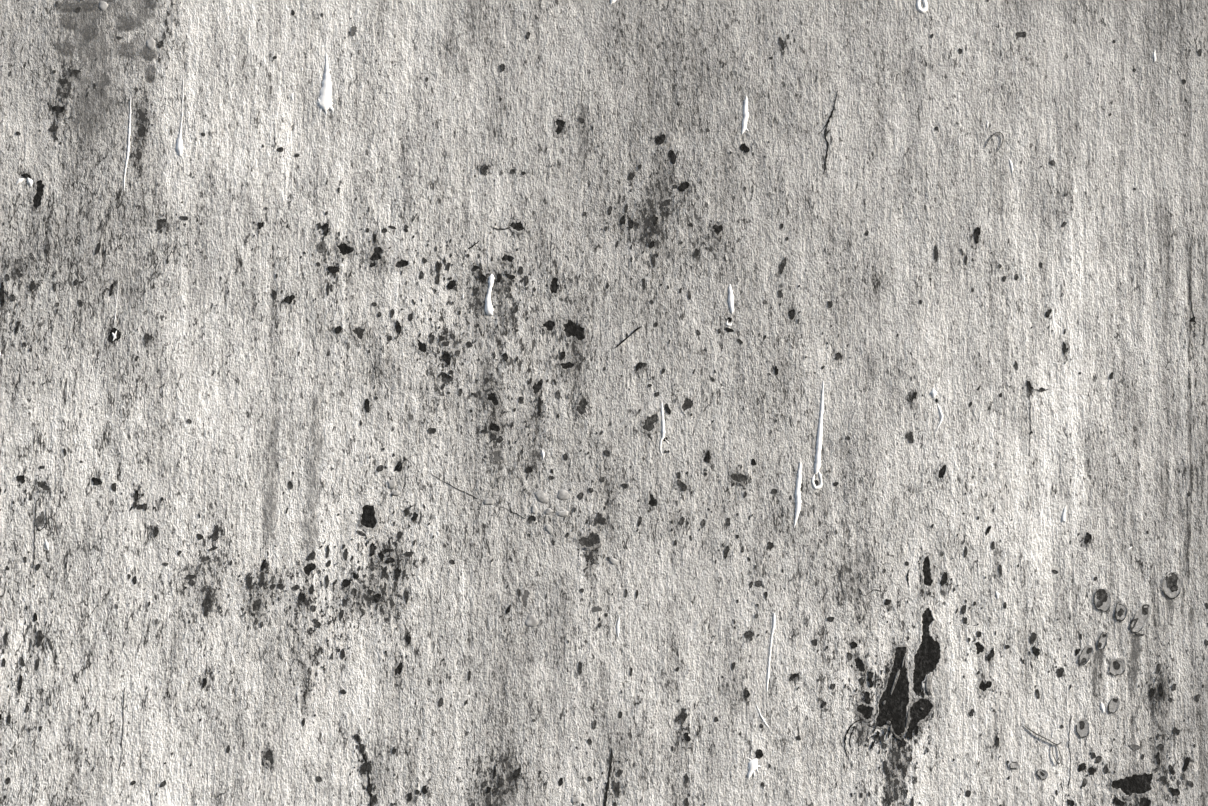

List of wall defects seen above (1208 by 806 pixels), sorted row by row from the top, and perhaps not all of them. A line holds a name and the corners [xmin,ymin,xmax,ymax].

water stain [41,0,185,179]
crack [818,83,842,174]
water stain [849,726,931,806]